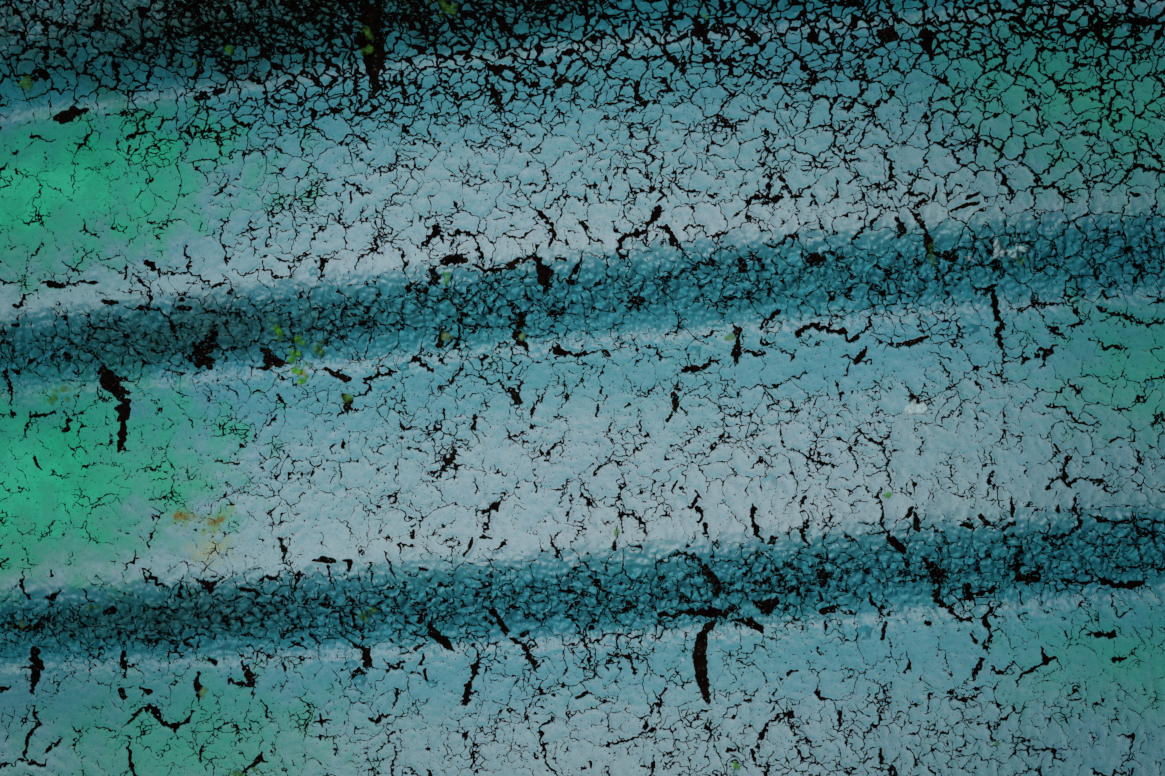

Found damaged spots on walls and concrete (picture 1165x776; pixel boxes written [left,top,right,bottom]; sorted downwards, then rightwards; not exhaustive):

peeling [53,105,89,124]
crack [839,346,872,377]
peeling [97,363,132,455]
crack [0,439,64,517]
peeling [674,549,735,704]
peeling [5,621,45,695]
crack [1110,674,1165,722]
crack [42,736,62,756]
crack [292,749,338,776]
crack [596,752,616,776]
crack [1100,707,1129,747]